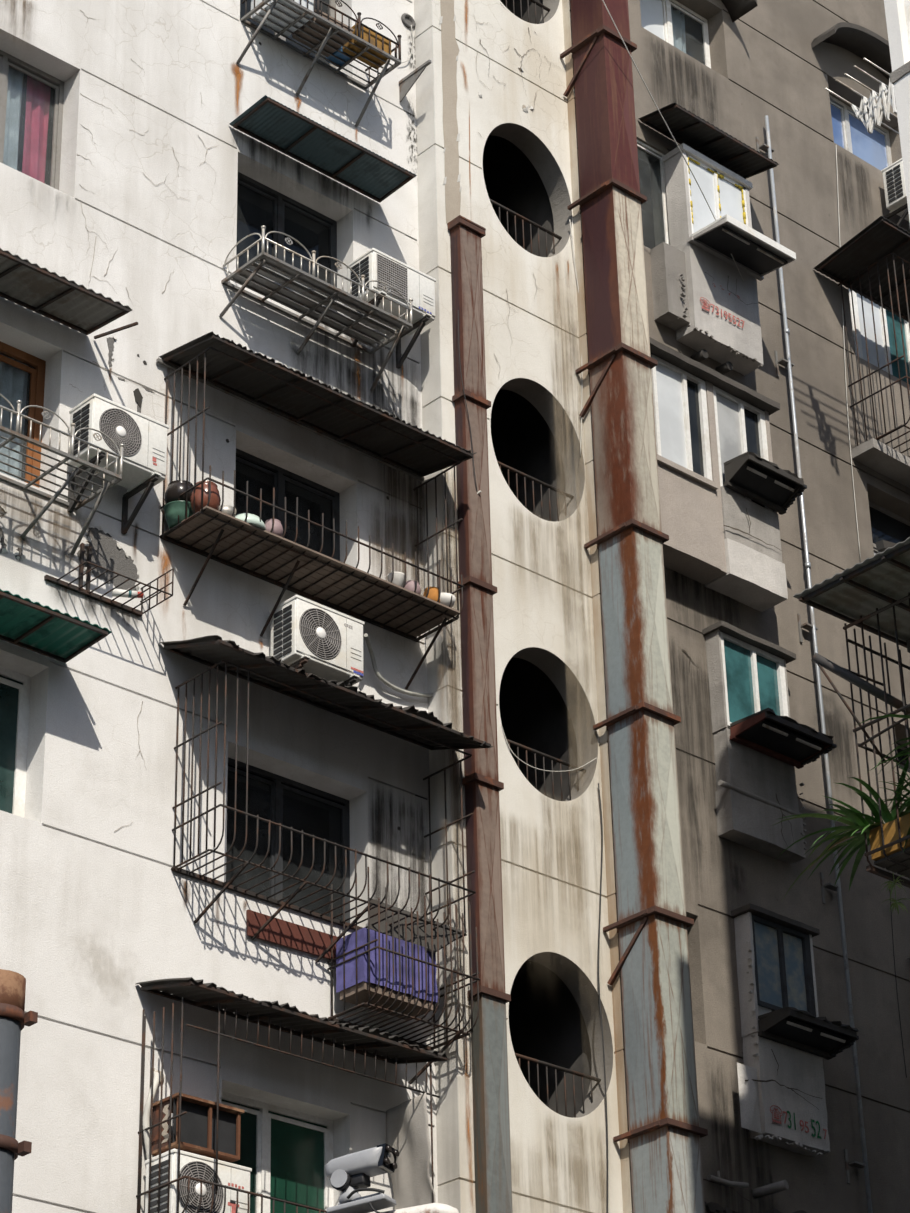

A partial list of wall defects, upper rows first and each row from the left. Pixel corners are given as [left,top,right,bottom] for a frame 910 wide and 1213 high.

rust [232,65,241,110]
crack [79,93,131,300]
crack [143,92,216,200]